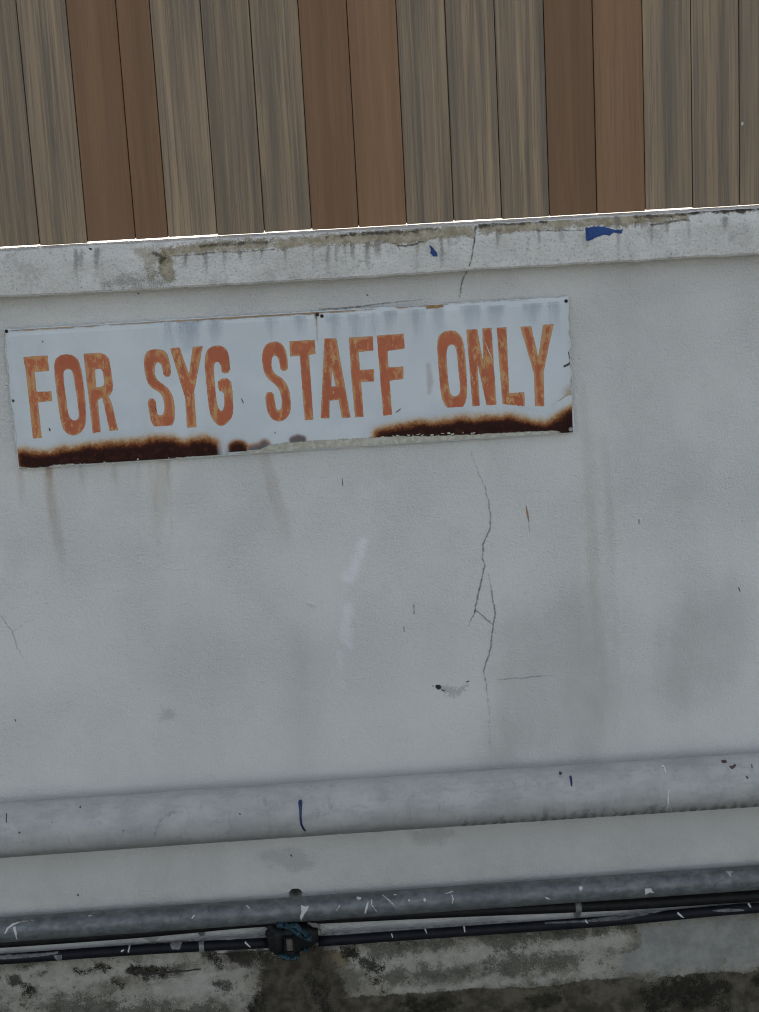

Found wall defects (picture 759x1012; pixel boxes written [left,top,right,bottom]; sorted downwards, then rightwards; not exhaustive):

leakage [153,208,759,264]
crack [474,523,496,668]
leakage [0,974,37,999]
leakage [50,938,466,1012]
leakage [477,925,634,977]